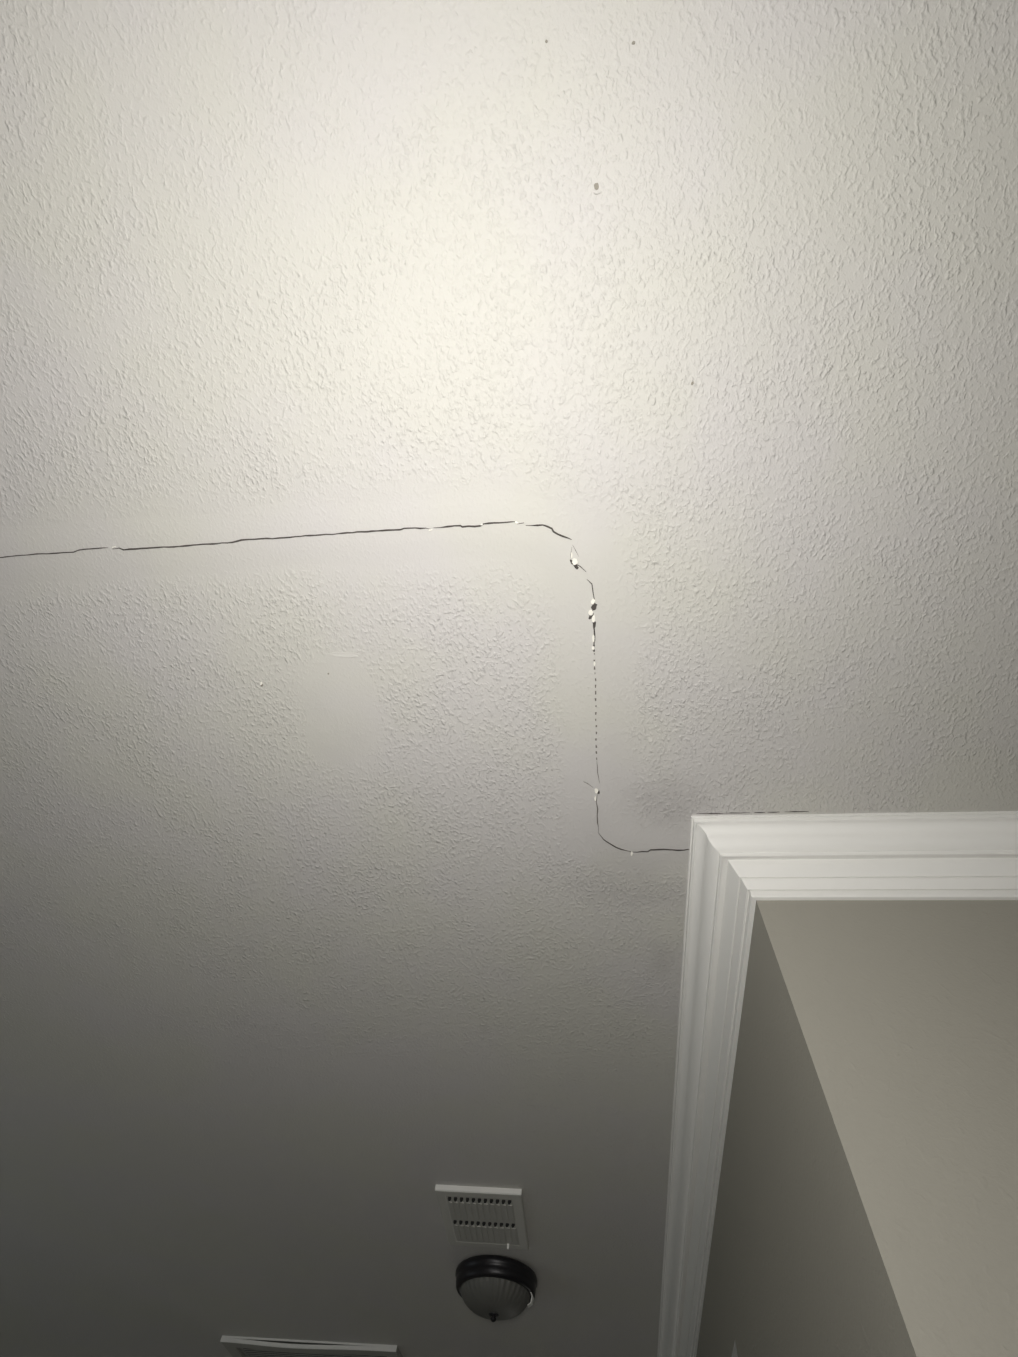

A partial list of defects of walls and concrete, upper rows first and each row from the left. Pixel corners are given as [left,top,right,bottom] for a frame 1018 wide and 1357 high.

crack [0,521,689,856]